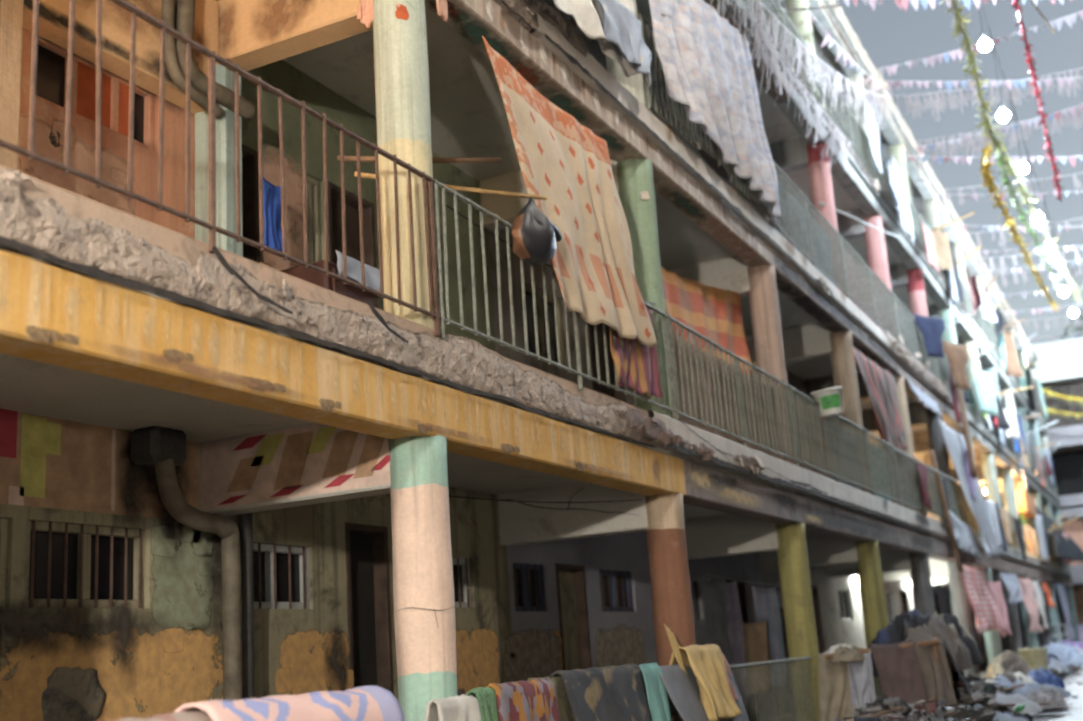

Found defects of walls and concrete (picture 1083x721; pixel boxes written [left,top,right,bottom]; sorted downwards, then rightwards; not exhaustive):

water stain [218,8,233,50]
water stain [256,0,310,38]
spalling [0,114,718,461]
water stain [123,439,181,540]
water stain [208,534,222,599]
peeling [0,521,223,721]
peeling [275,630,354,695]
peeling [456,628,561,696]